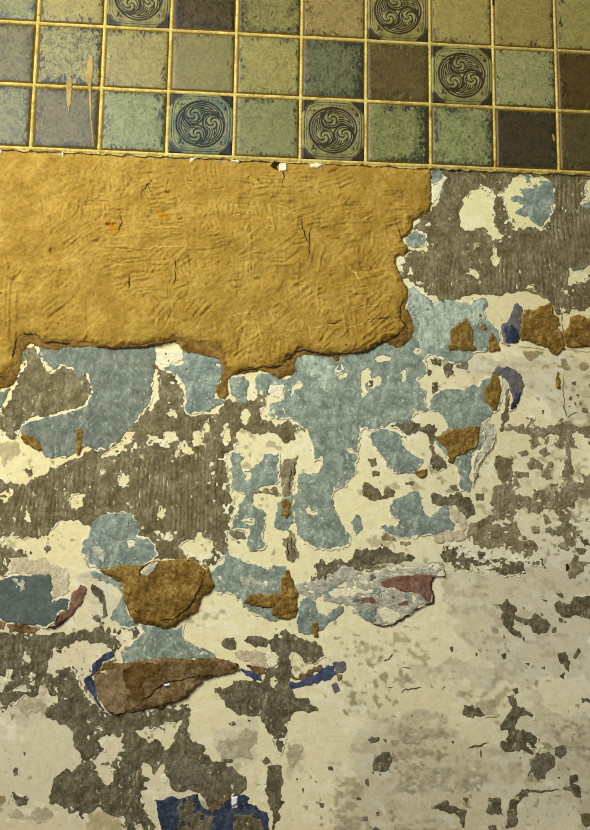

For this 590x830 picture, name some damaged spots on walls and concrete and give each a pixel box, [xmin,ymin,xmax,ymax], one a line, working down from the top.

flaking render [270,161,287,172]
spalling [0,169,590,830]